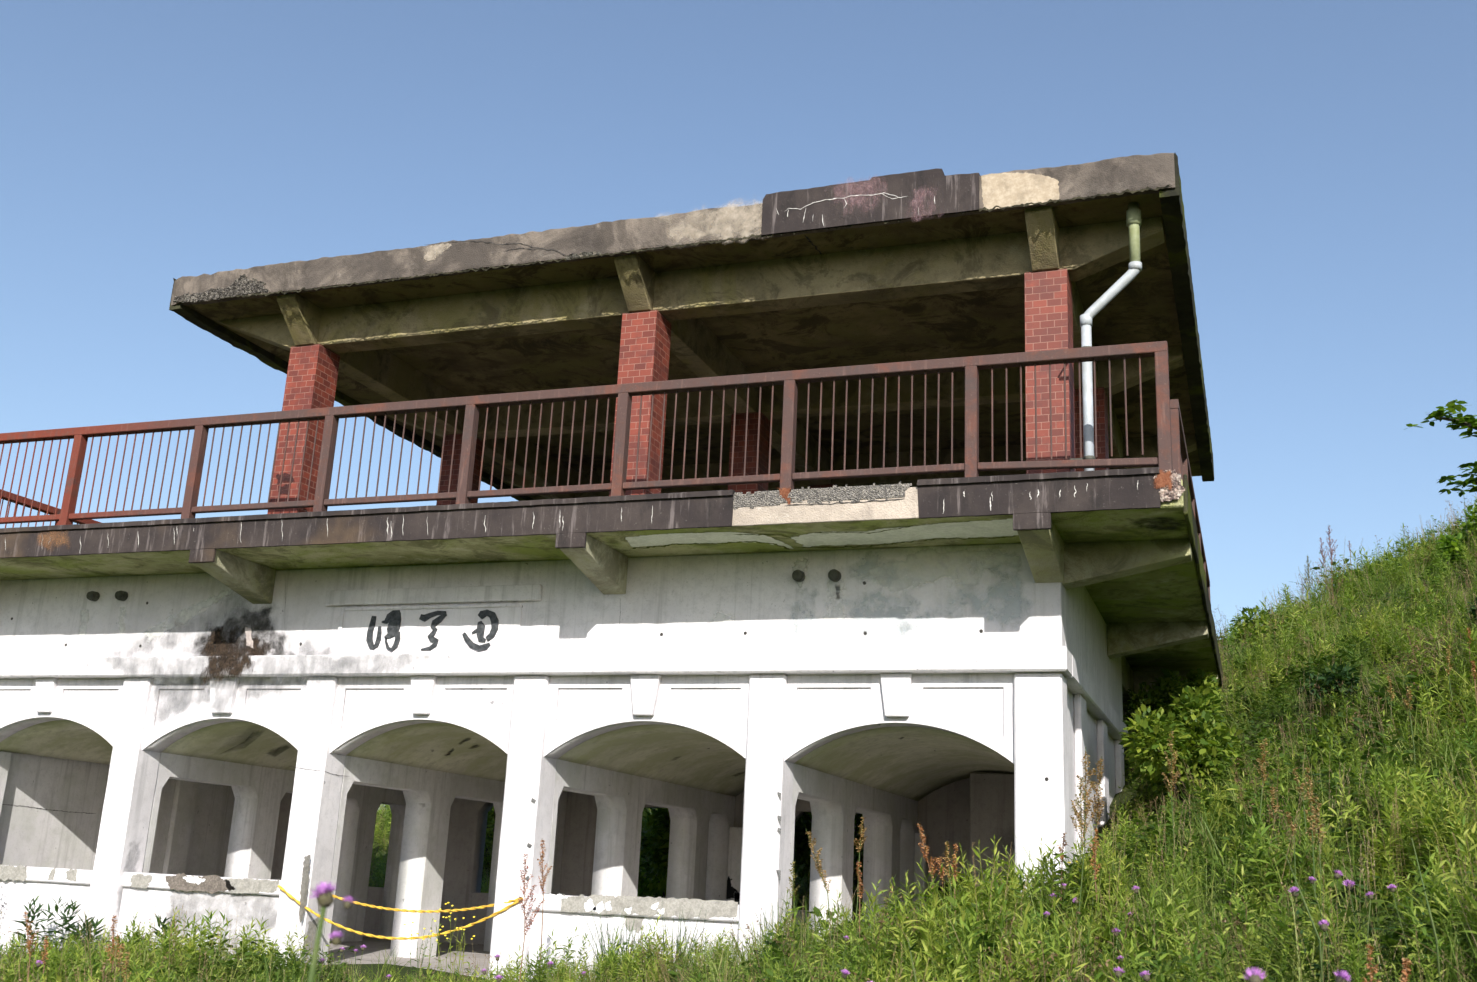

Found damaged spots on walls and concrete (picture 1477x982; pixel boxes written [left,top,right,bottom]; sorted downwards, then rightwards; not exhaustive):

spalling [173,274,268,303]
spalling [733,482,912,510]
spalling [1153,469,1185,502]
leakage [825,617,847,645]
leakage [165,608,293,712]
peeling [130,873,279,894]